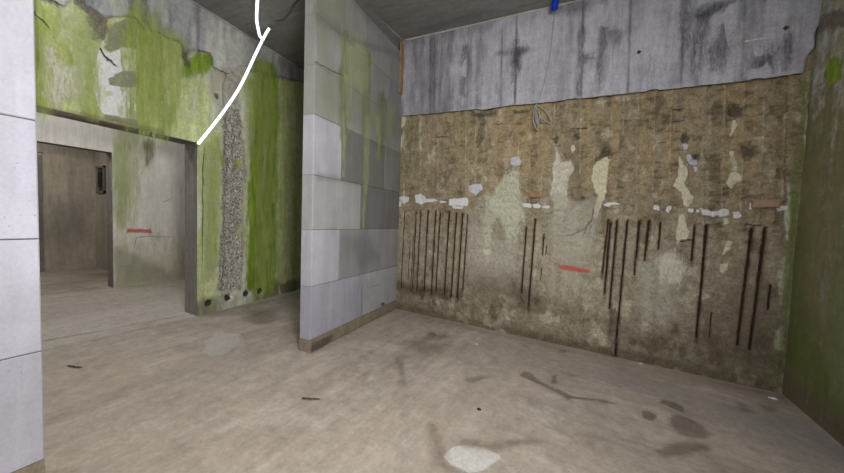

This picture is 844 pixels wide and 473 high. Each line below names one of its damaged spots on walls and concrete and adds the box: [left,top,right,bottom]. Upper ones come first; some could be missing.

water stain [34,0,215,288]
spalling [206,66,247,292]
water stain [240,54,283,324]
water stain [306,0,400,274]
peeling [399,132,662,357]
water stain [575,25,631,97]
peeling [653,132,752,345]
water stain [674,0,741,91]
spalling [727,100,747,136]
peeling [726,142,759,189]
spalling [735,182,794,358]